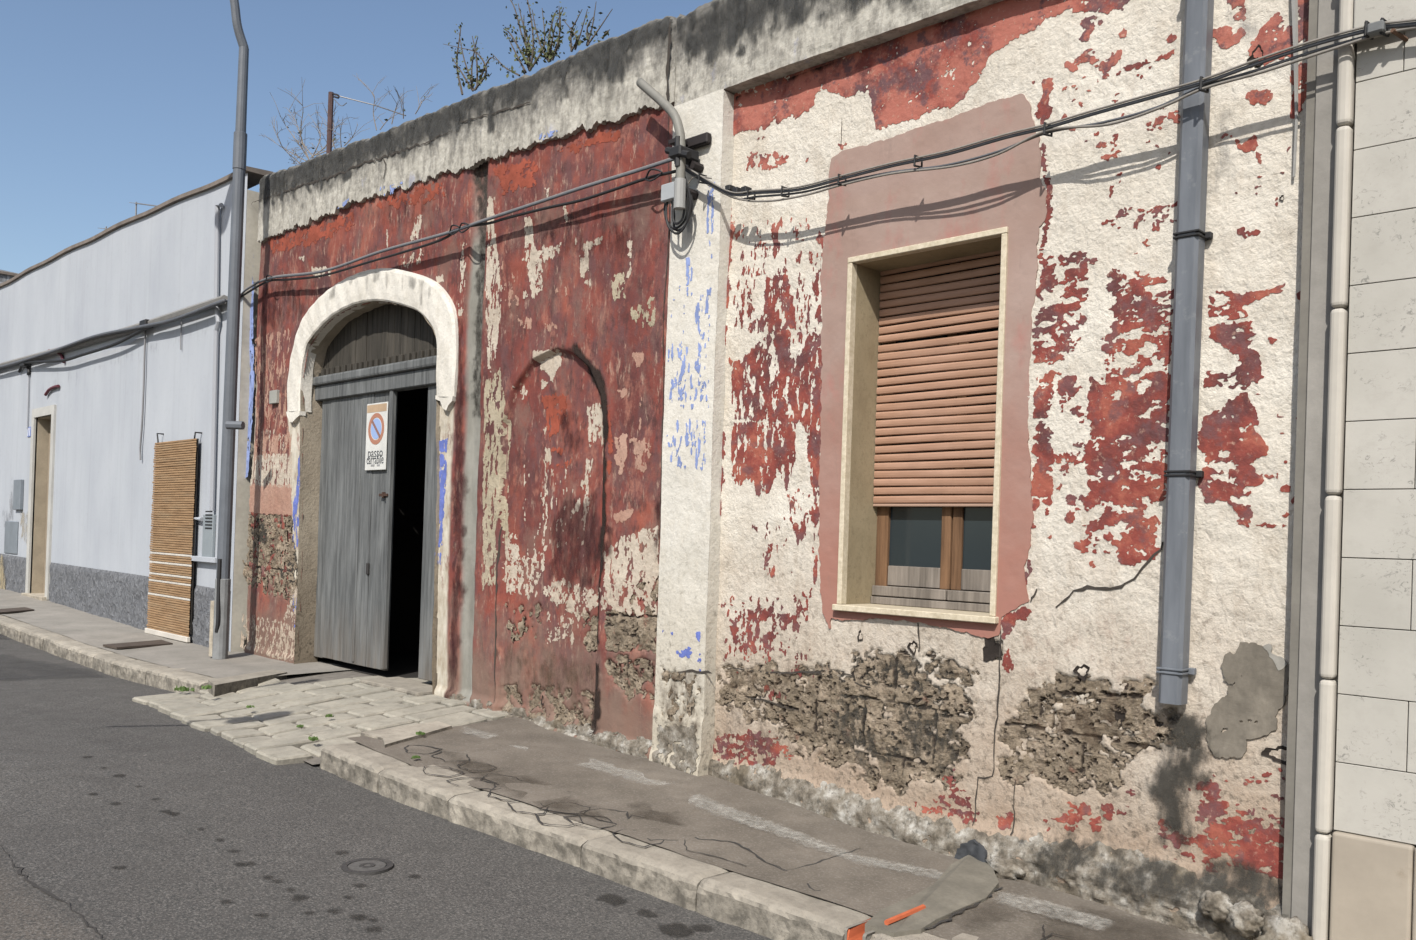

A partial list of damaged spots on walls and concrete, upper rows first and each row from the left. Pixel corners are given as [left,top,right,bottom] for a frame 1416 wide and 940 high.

leakage [259,0,822,204]
leakage [843,0,911,14]
peeling [1213,0,1309,119]
peeling [733,0,1180,568]
flaking render [240,276,300,661]
peeling [481,158,701,722]
flaking render [611,182,1014,830]
crack [1030,542,1163,608]
peeling [1197,283,1301,528]
flaking render [998,673,1190,832]
leakage [1149,711,1210,842]
crack [1,846,105,940]